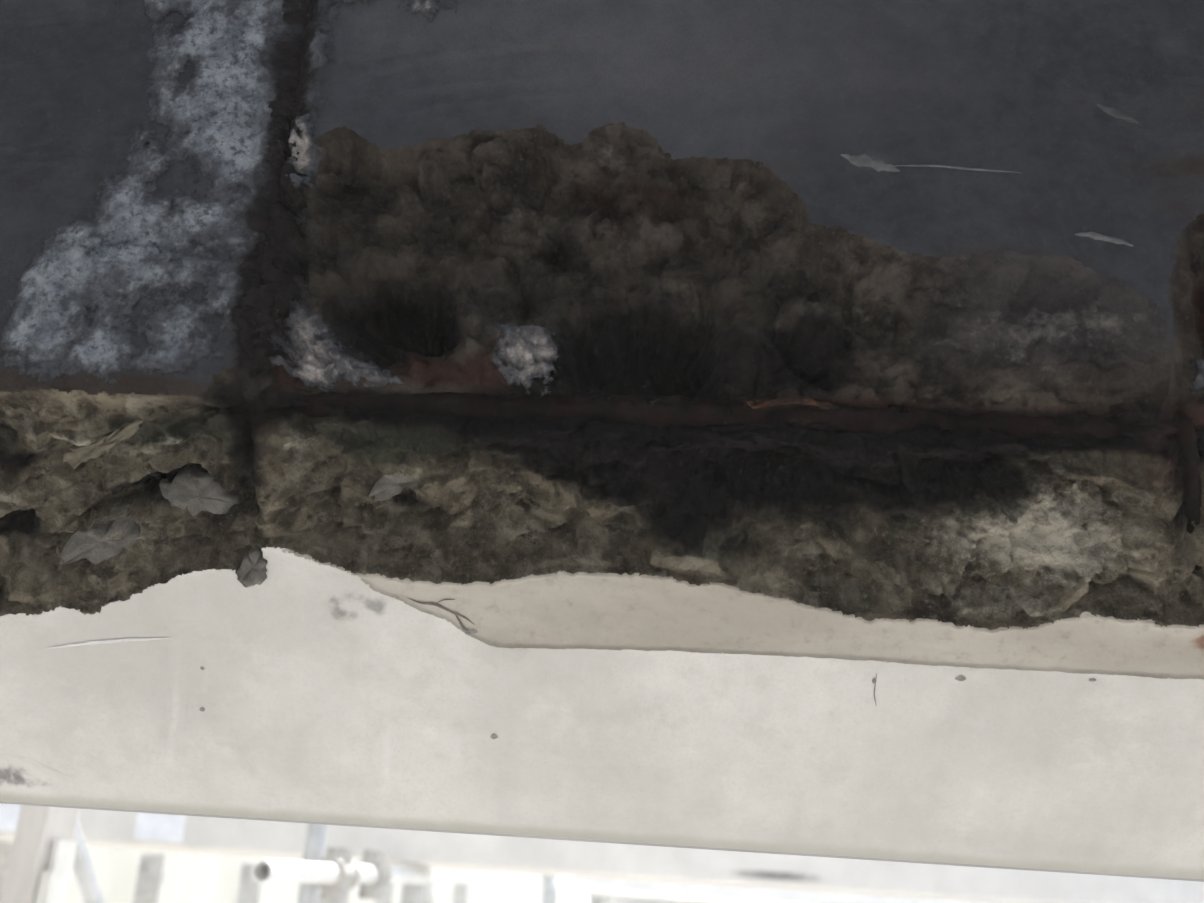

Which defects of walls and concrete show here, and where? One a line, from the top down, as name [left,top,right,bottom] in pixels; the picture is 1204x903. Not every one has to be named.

damp [0,0,404,403]
spalling [0,122,1204,682]
crack [408,598,473,631]